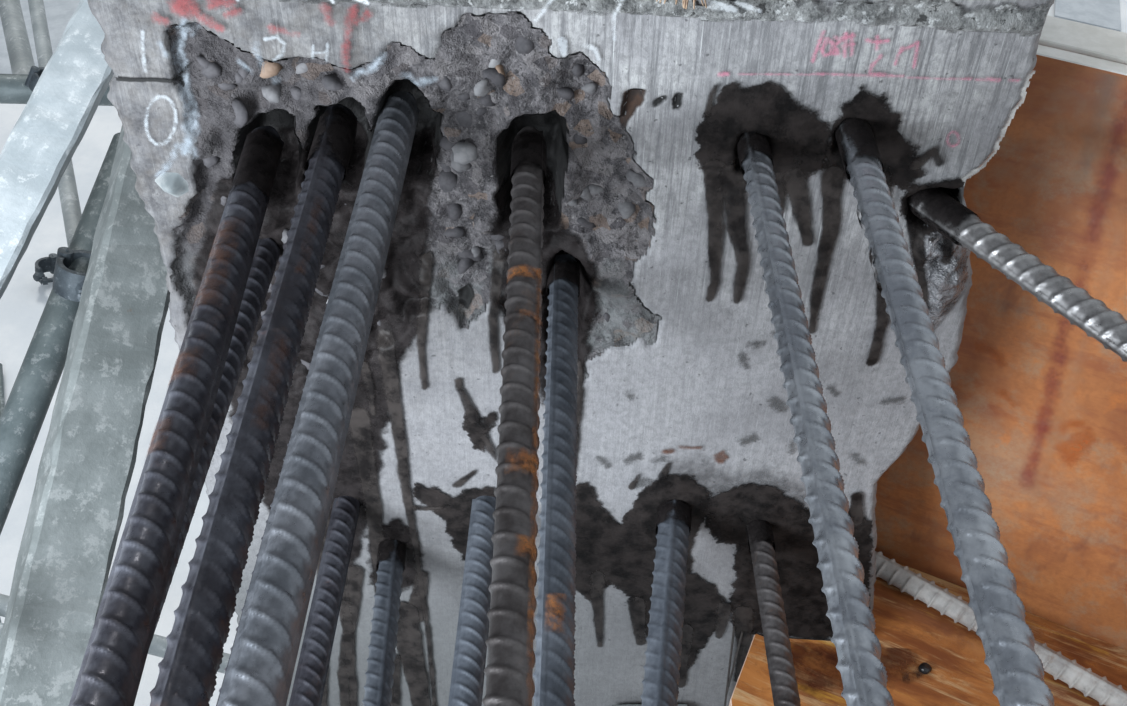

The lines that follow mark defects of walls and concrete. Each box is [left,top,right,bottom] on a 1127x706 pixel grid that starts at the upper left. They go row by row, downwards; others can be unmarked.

water stain [704,85,718,117]
water stain [703,158,750,304]
water stain [774,165,844,334]
water stain [866,269,890,366]
spalling [69,12,661,706]
water stain [321,329,443,706]
water stain [452,471,476,488]
water stain [850,493,864,526]
water stain [590,571,605,647]
water stain [627,596,646,645]
water stain [715,602,754,682]
water stain [791,645,842,690]